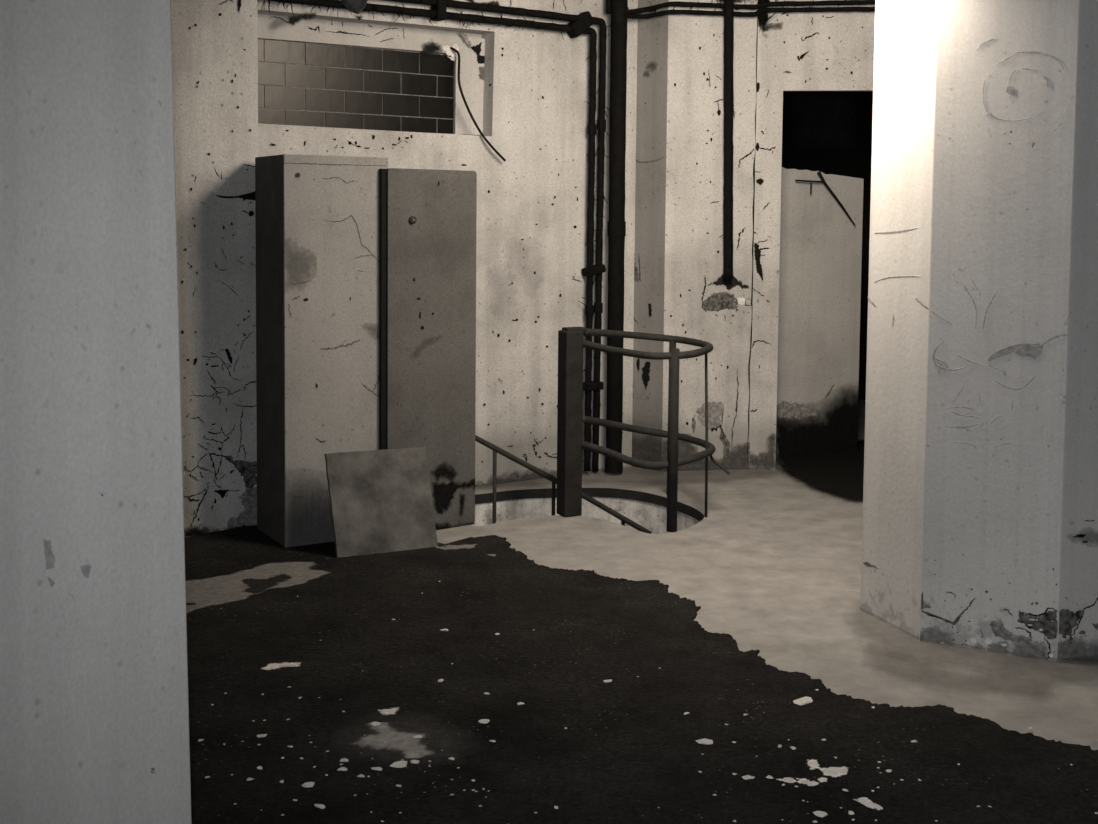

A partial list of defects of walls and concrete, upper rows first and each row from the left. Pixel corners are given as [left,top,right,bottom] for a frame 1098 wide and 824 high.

flaking render [680,277,752,317]
crack [184,381,256,527]
flaking render [211,447,257,528]
flaking render [921,574,1098,661]